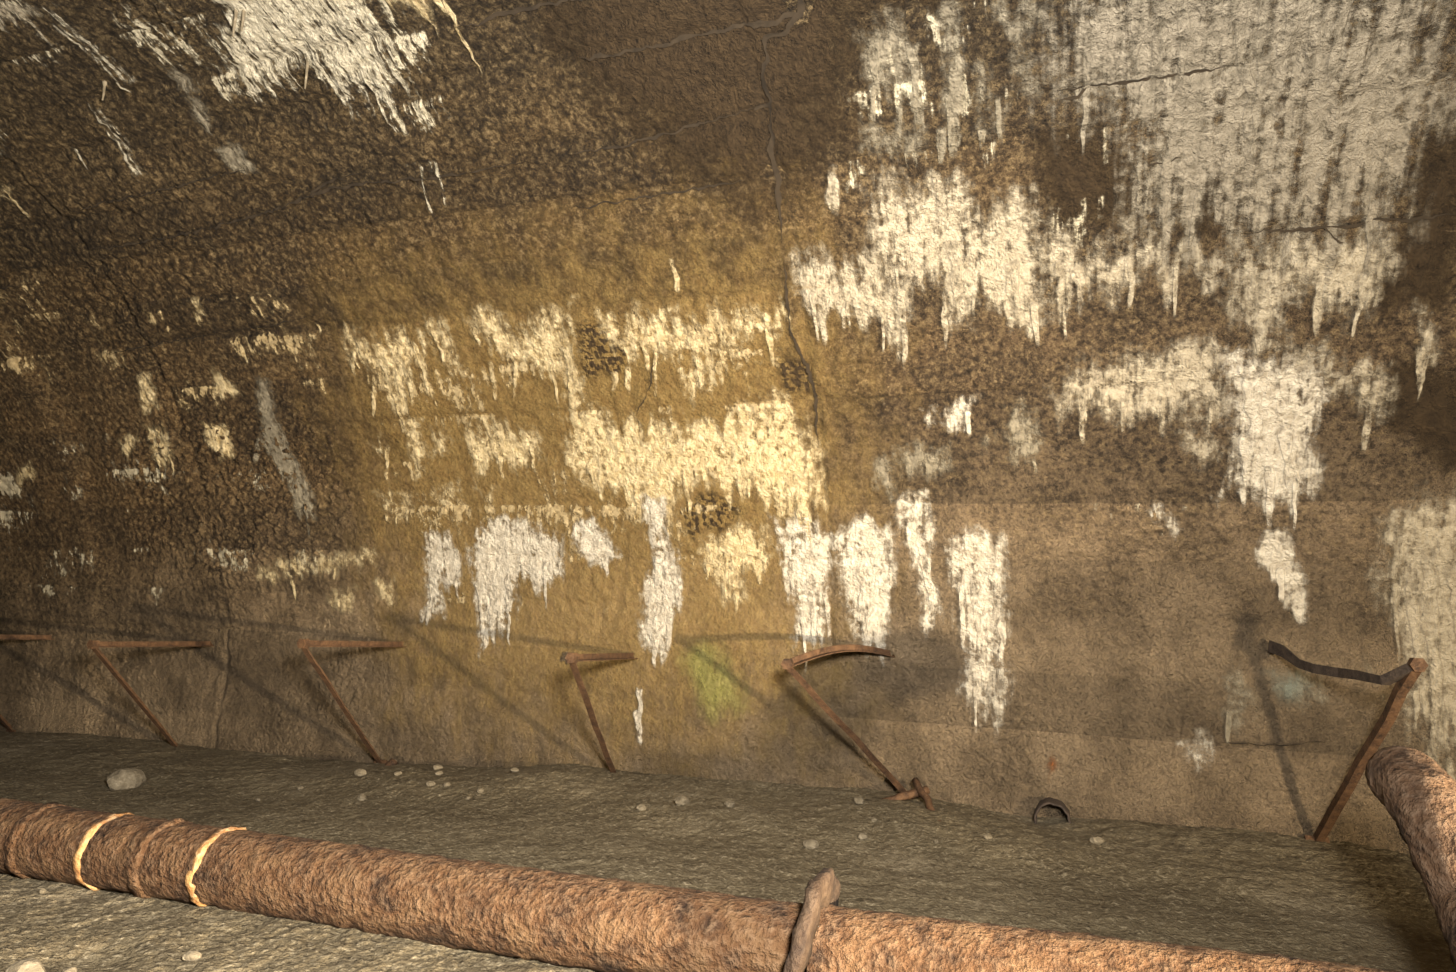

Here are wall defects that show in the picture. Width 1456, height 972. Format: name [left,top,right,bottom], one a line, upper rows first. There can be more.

water stain [214,0,409,130]
water stain [386,0,480,67]
water stain [544,0,1456,623]
water stain [214,372,238,398]
water stain [345,320,462,476]
water stain [383,492,411,524]
water stain [421,495,615,648]
water stain [466,303,1006,727]
water stain [1371,499,1456,780]
water stain [633,688,643,744]
water stain [1181,673,1251,768]